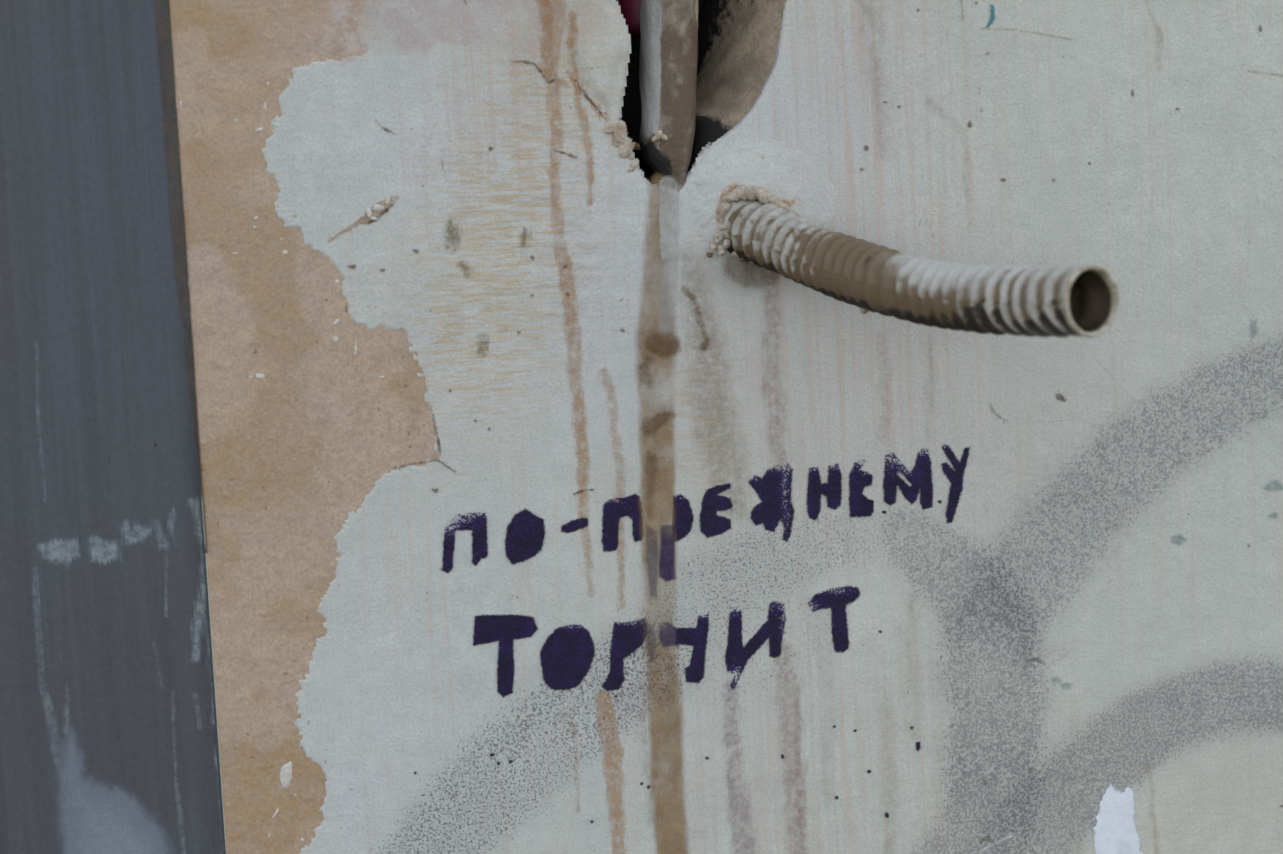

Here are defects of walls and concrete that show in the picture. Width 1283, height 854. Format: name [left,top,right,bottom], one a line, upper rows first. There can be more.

spalling [597,36,660,186]
spalling [687,0,787,174]
peeling [168,0,449,854]
corrosion [576,394,587,517]
peeling [60,734,169,854]
corrosion [598,692,623,849]